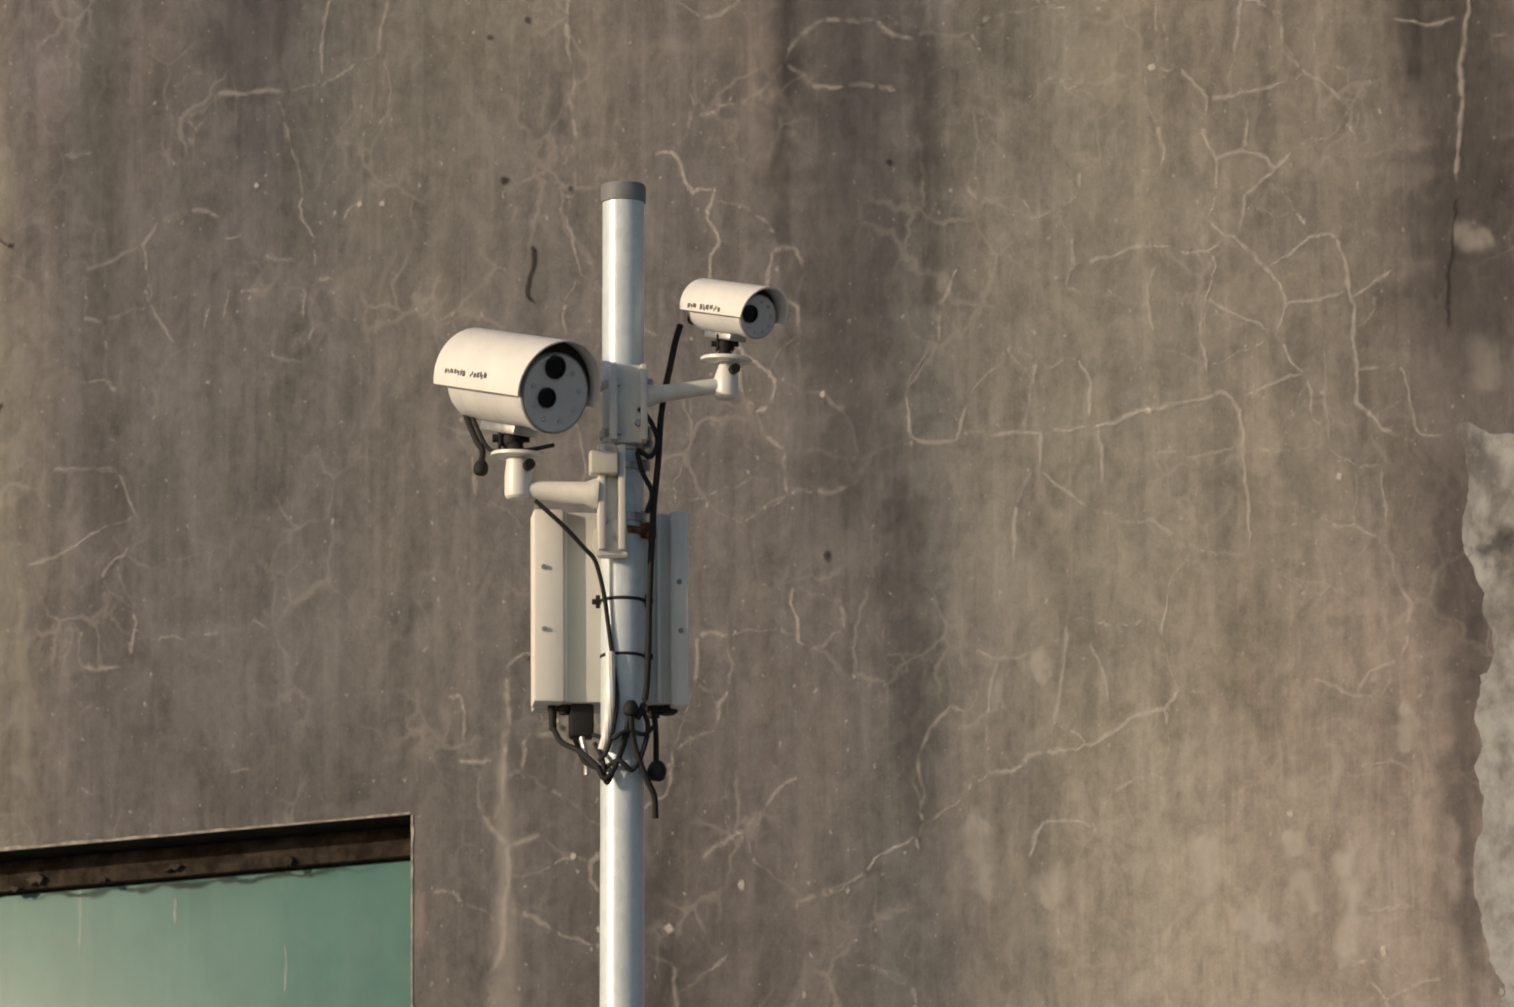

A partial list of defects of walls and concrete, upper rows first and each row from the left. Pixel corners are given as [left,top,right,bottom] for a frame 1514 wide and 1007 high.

crack [525,246,536,301]
crack [1445,201,1456,322]
flaking render [1457,422,1514,1007]